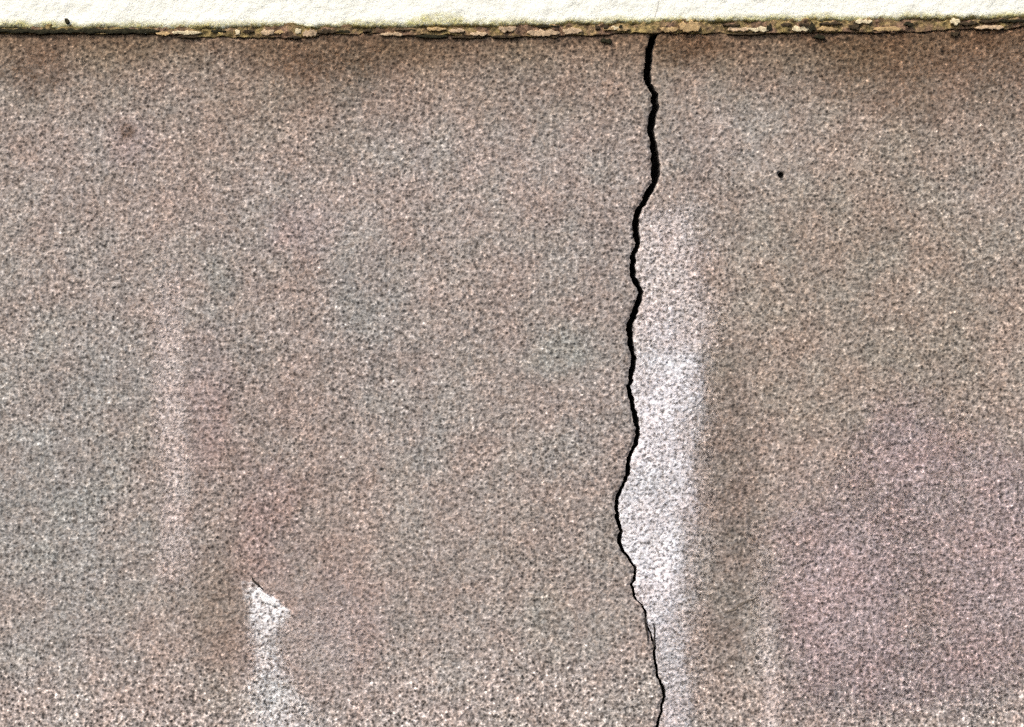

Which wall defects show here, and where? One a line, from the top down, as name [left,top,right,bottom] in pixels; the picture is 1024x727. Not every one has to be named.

crack [614,0,666,727]